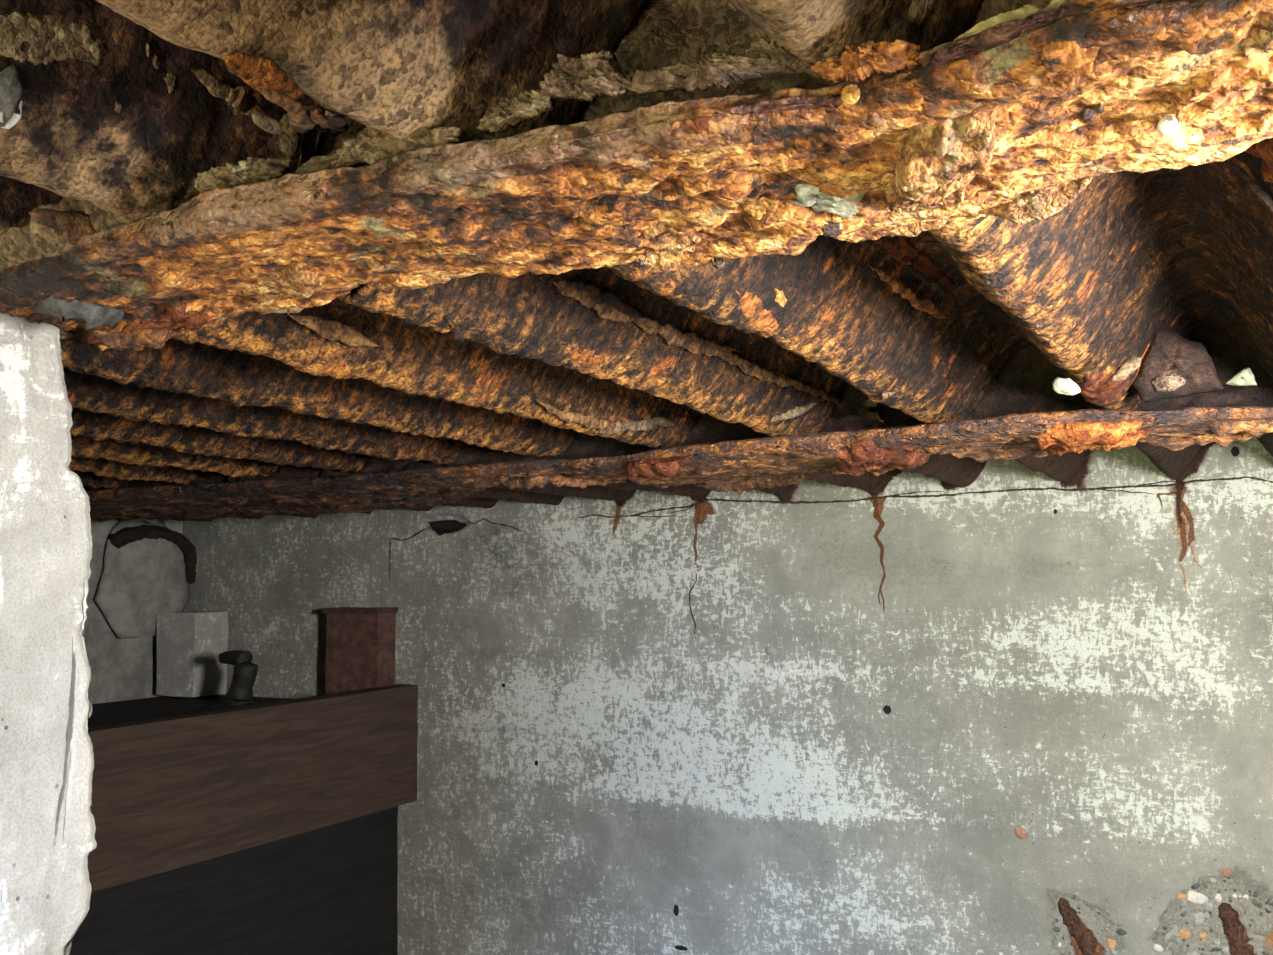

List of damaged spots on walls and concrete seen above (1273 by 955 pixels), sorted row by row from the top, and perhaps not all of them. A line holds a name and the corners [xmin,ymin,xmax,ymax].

corrosion [1079,103,1105,124]
corrosion [747,179,763,198]
corrosion [605,225,640,248]
corrosion [823,213,843,237]
corrosion [736,290,779,334]
corrosion [1075,368,1133,406]
corrosion [865,469,902,496]
corrosion [1060,451,1091,492]
corrosion [1157,442,1215,589]
corrosion [689,495,715,639]
spalling [1048,890,1127,955]
spalling [1151,868,1273,955]